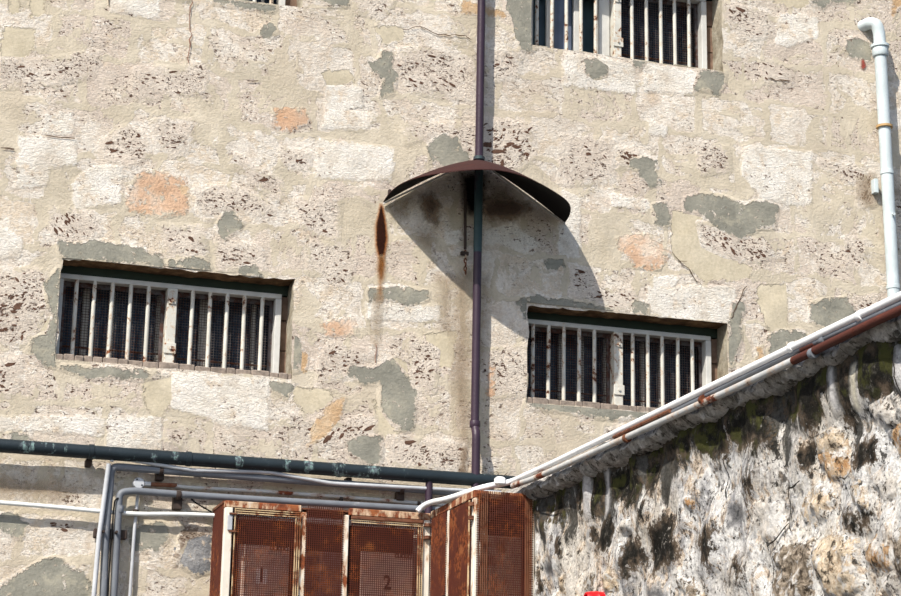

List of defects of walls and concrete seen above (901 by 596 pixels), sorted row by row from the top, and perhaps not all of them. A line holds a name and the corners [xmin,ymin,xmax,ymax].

crack [186,1,194,63]
peeling [889,105,901,131]
rust [375,204,388,300]
water stain [421,193,440,224]
water stain [461,174,532,221]
spalling [482,132,739,323]
spalling [301,301,443,395]
peeling [0,371,469,473]
water stain [533,340,901,596]
crack [767,466,851,596]